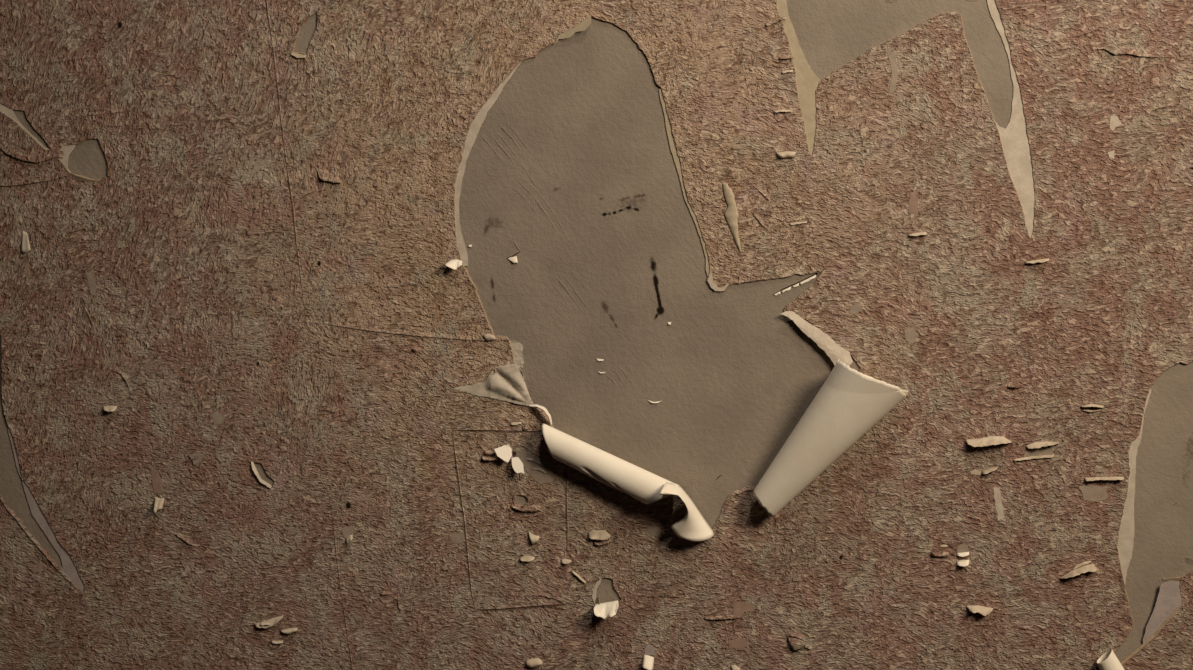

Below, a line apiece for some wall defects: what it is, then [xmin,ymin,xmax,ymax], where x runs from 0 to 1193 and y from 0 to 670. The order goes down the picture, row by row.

peeling [0,104,108,186]
peeling [765,0,1035,238]
peeling [445,16,909,541]
peeling [588,530,612,545]